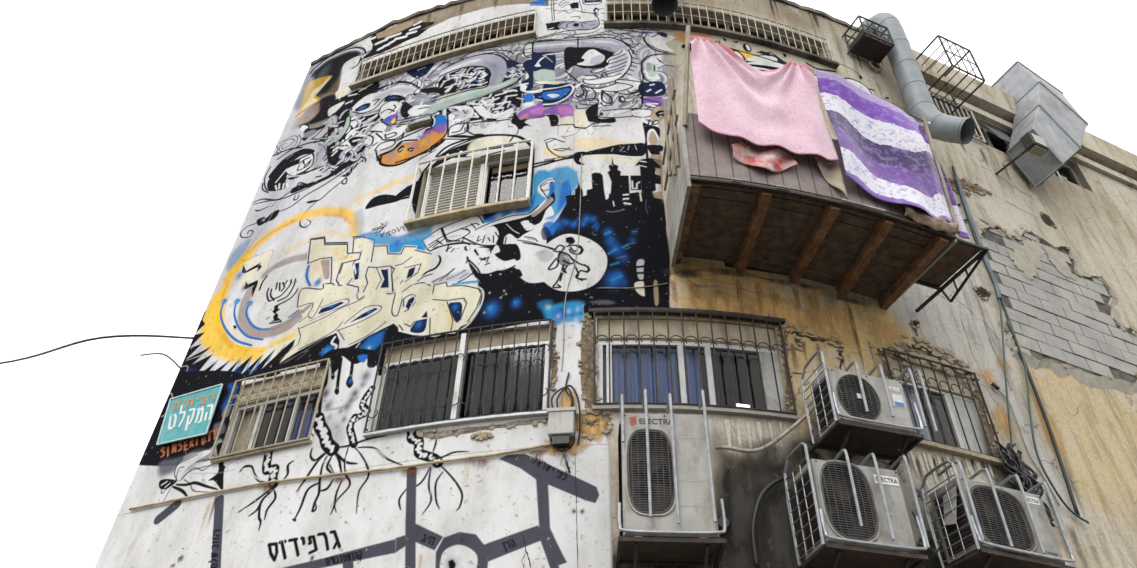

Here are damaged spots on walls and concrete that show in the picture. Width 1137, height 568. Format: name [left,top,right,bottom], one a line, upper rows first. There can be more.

spalling [575,313,613,440]
damp [672,269,897,363]
flaking render [948,177,1137,395]
damp [1033,394,1063,453]